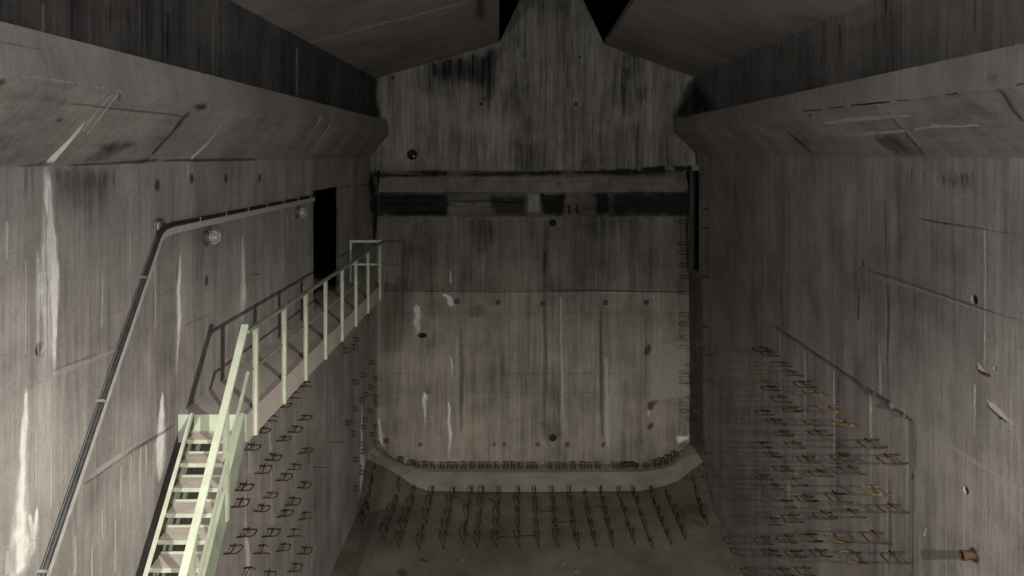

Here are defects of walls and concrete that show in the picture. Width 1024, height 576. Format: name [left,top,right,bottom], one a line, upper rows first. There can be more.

water stain [25,94,119,369]
water stain [413,305,421,332]
water stain [5,391,52,576]